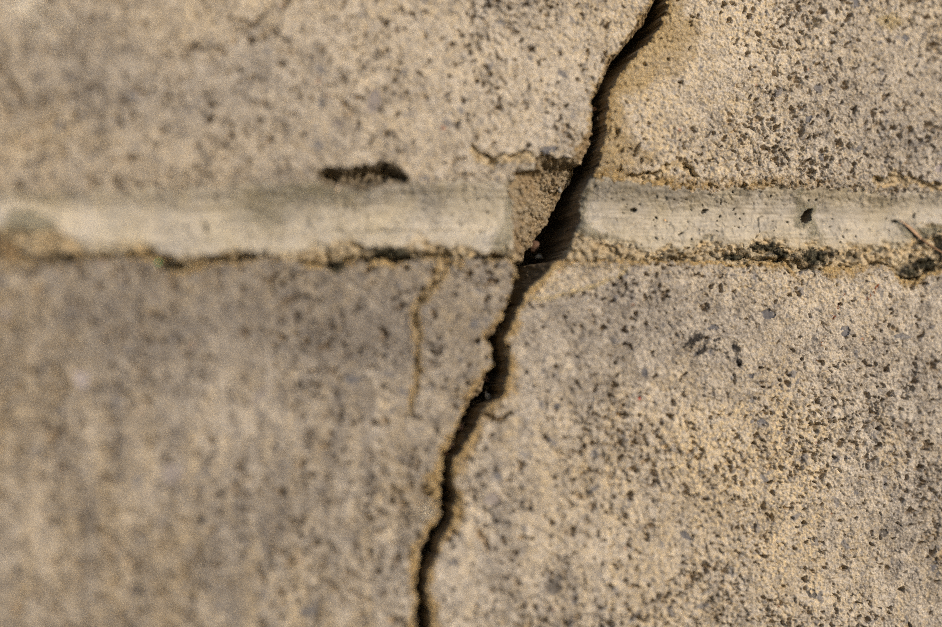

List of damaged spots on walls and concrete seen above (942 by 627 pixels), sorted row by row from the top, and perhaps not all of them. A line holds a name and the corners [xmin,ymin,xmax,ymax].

spalling [315,160,411,191]
spalling [0,237,70,268]
crack [0,228,397,270]
crack [386,0,942,627]